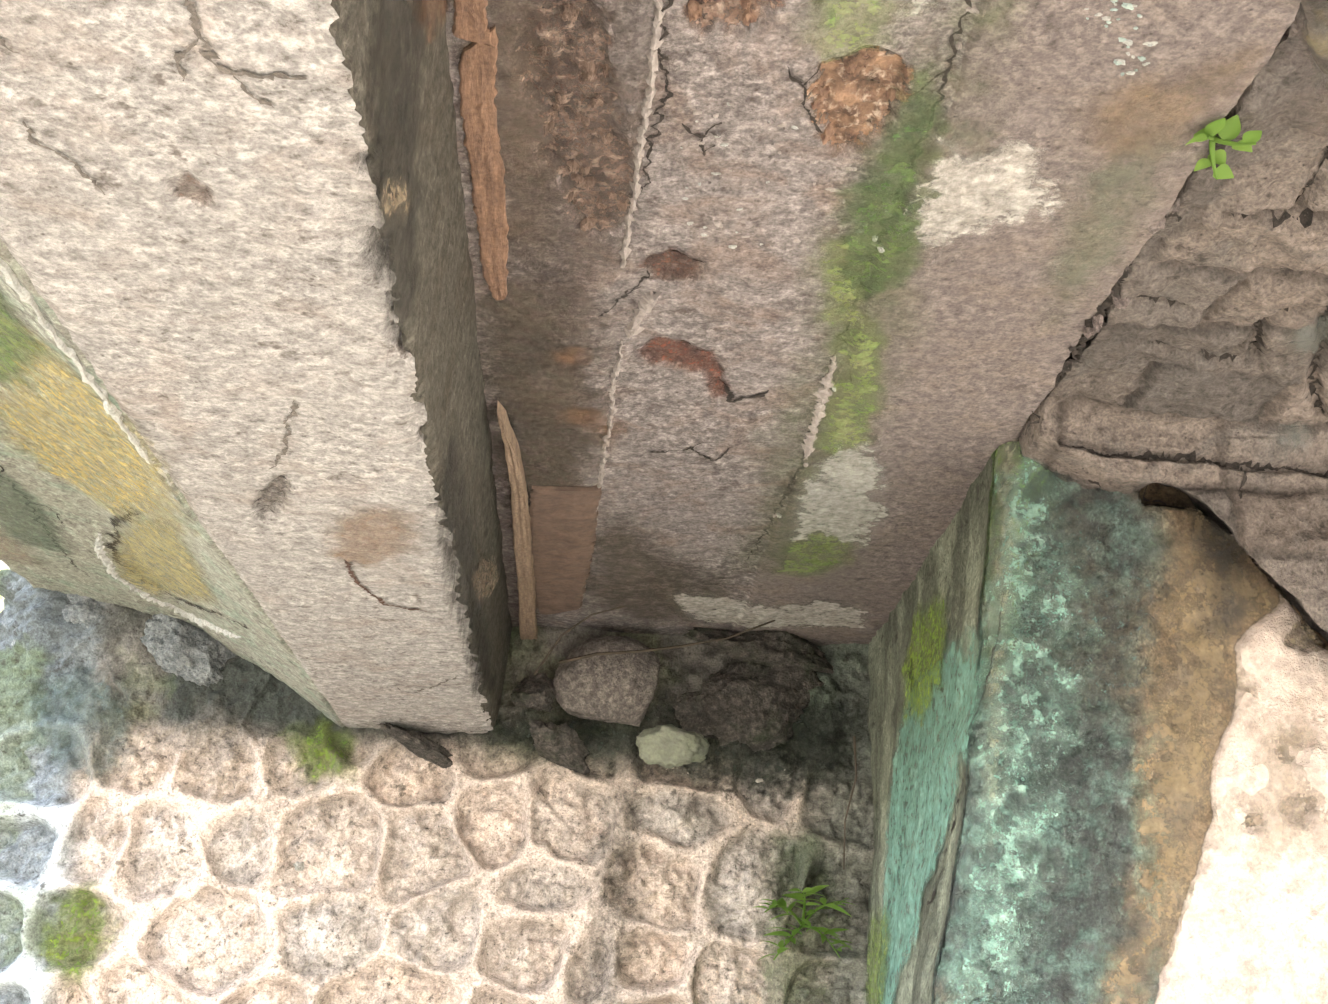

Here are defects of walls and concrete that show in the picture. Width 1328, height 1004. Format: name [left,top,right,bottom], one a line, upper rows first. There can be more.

crack [174,0,307,109]
spalling [505,0,634,234]
peeling [671,102,750,165]
spalling [684,0,785,37]
spalling [754,45,916,165]
crack [910,0,980,168]
peeling [682,170,770,250]
water stain [904,142,1063,246]
spalling [638,247,707,281]
rust [637,337,769,403]
crack [742,217,893,565]
water stain [791,443,889,546]